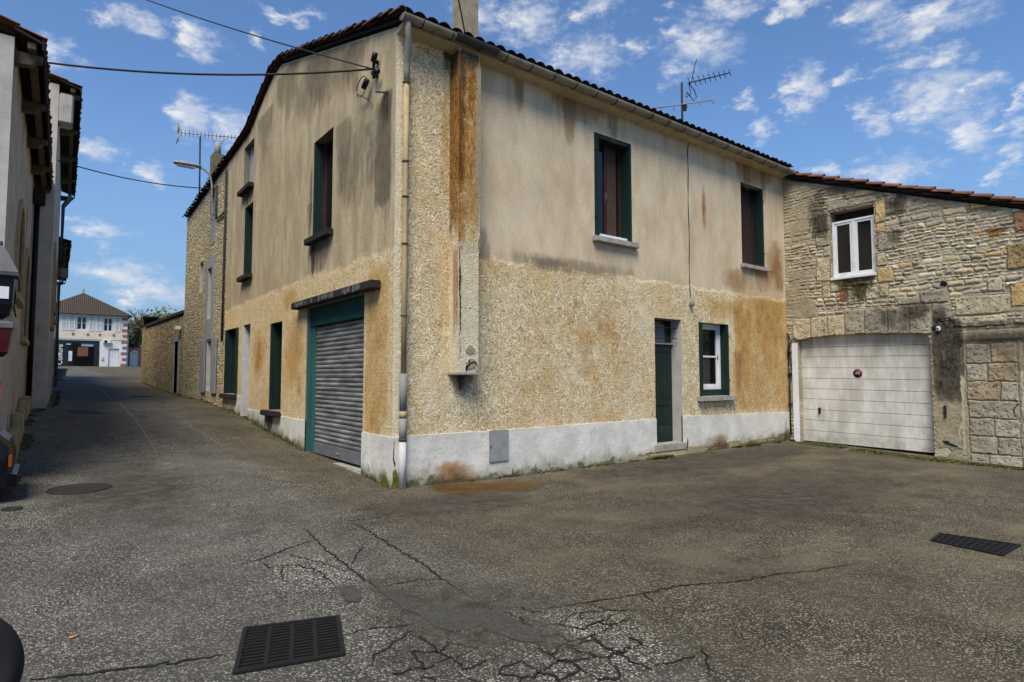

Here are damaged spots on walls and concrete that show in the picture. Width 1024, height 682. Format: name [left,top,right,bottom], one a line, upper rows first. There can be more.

damp [366,89,388,172]
rust [450,51,481,235]
damp [905,305,967,455]
crack [241,509,492,610]
crack [532,562,860,611]
crack [347,621,422,667]
crack [552,639,711,676]